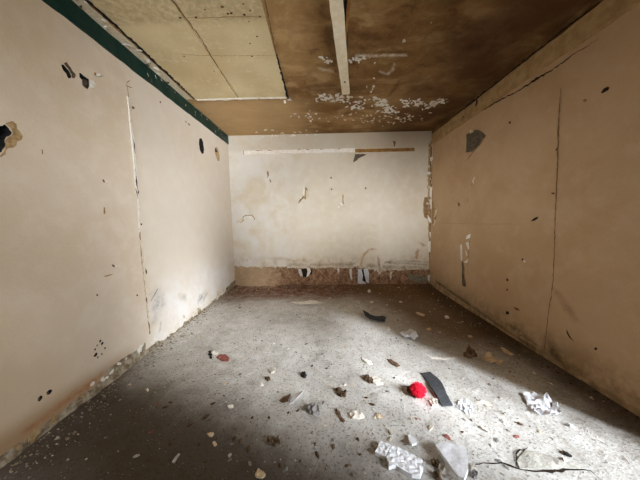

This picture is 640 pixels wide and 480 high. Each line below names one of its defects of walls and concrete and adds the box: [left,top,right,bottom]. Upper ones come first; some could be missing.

water stain [295,0,371,99]
water stain [353,0,586,99]
spalling [61,62,101,89]
peeling [315,77,448,127]
spalling [0,121,23,157]
spalling [465,130,486,157]
spalling [0,143,437,469]